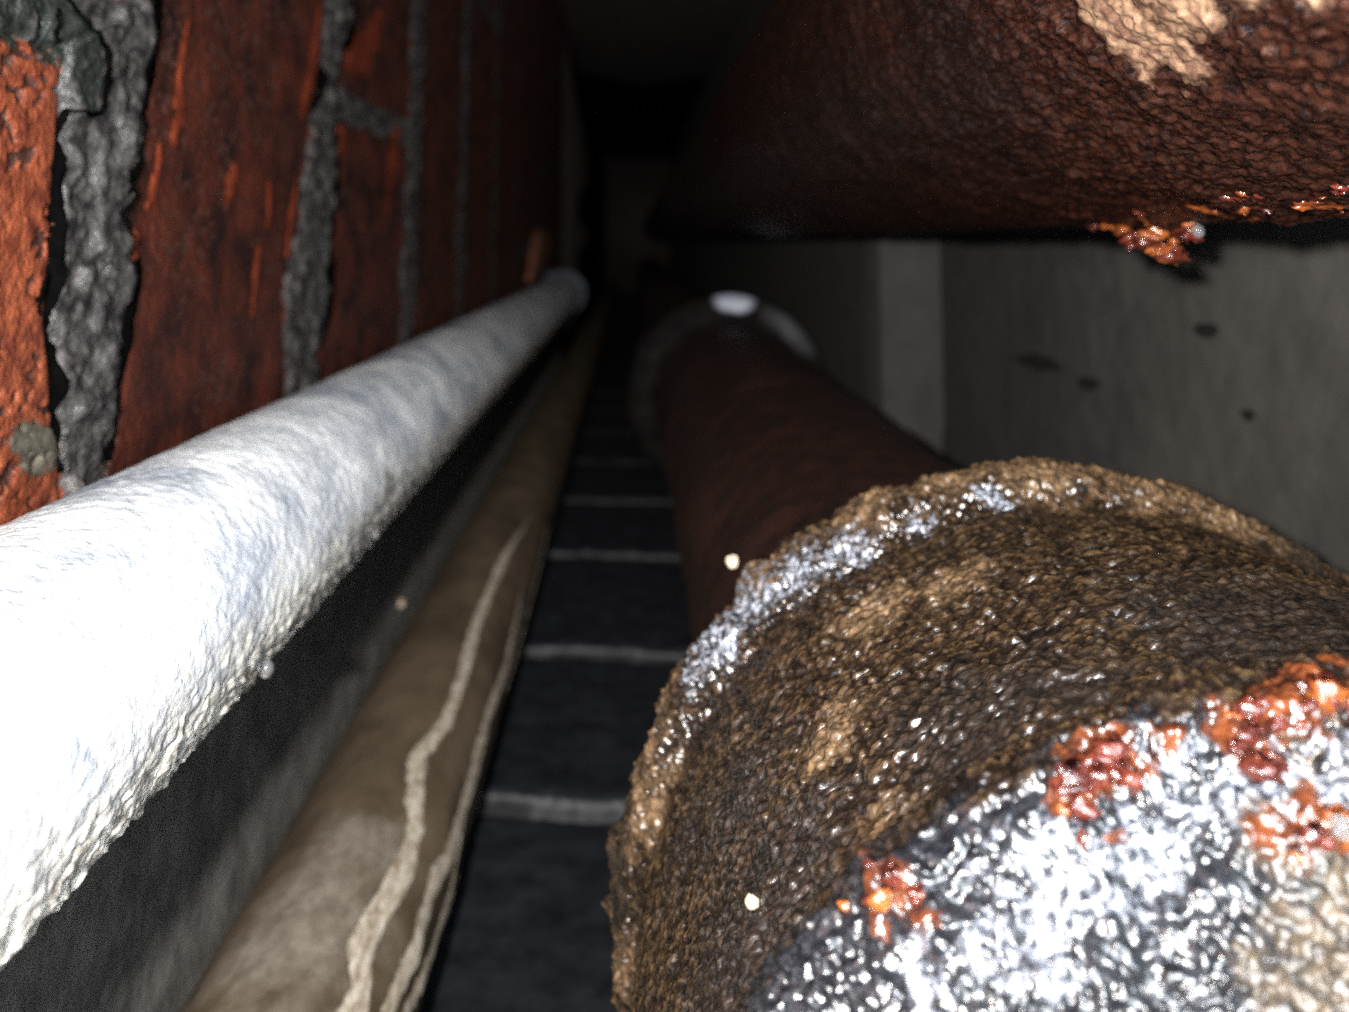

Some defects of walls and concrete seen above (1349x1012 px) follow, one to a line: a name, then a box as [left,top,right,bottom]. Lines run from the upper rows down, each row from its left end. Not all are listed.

rust [1210,183,1349,217]
rust [1086,209,1205,266]
rust [1222,667,1349,787]
rust [1044,732,1146,850]
rust [1289,804,1349,865]
rust [836,858,925,913]